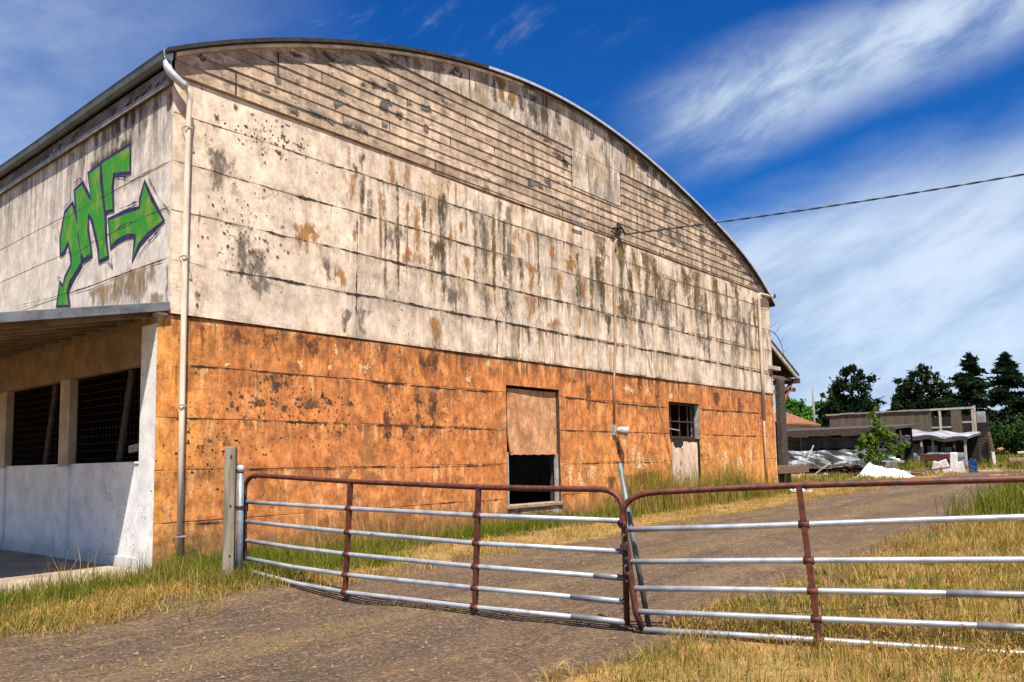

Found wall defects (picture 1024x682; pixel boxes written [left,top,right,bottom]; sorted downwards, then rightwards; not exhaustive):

damp [209,148,232,190]
damp [236,234,270,294]
rust [294,222,319,252]
damp [353,154,402,300]
damp [421,193,461,310]
damp [472,201,524,315]
damp [575,241,759,366]
damp [293,333,320,357]
damp [342,309,365,350]
damp [417,348,440,371]
rust [429,318,441,343]